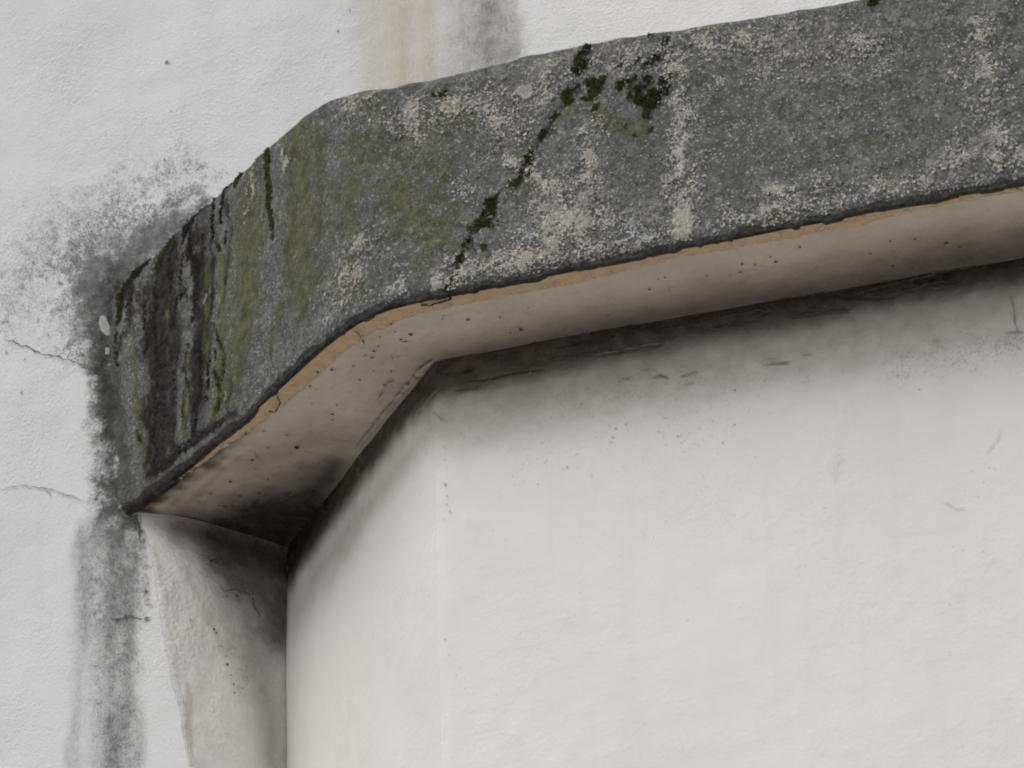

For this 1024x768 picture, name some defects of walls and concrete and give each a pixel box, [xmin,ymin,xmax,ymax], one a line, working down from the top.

damp [374,2,1024,292]
damp [324,222,382,303]
crack [4,339,107,374]
damp [109,191,237,504]
crack [2,485,80,500]
damp [200,465,335,630]